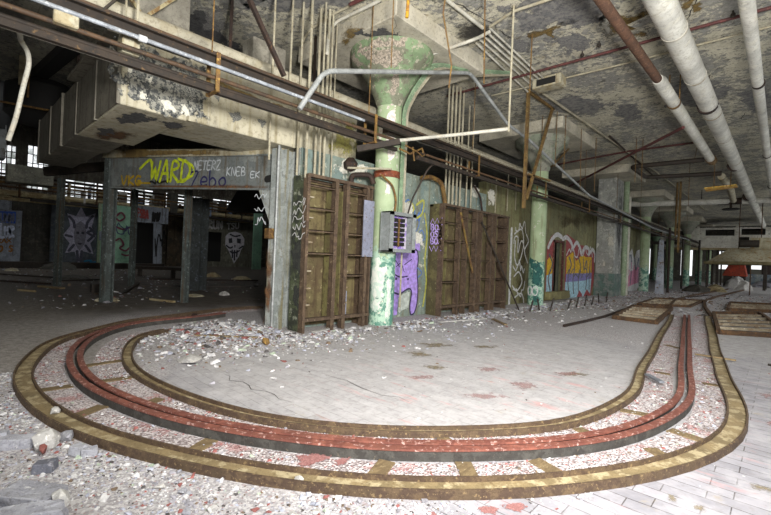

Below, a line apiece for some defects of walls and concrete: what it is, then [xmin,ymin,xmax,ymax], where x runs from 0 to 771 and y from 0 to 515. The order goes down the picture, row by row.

peeling [508,0,603,55]
peeling [107,63,220,129]
peeling [139,43,206,79]
peeling [341,28,408,122]
peeling [537,90,646,123]
peeling [670,80,697,107]
peeling [711,81,756,118]
peeling [370,251,392,319]
peeling [530,257,543,303]